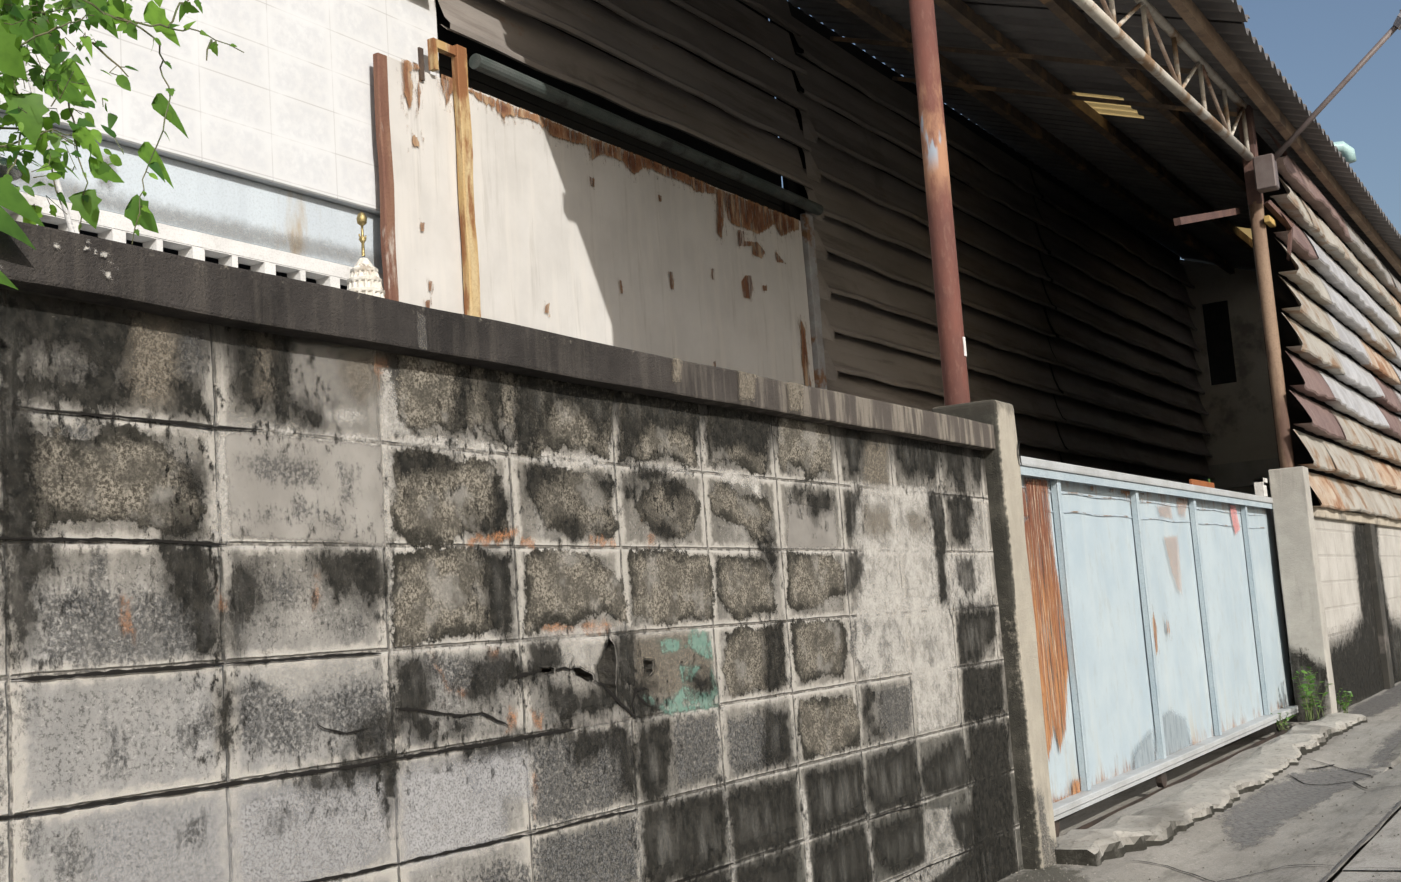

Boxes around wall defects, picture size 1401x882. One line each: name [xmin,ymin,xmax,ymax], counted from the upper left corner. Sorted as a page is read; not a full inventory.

rust [402,60,421,110]
rust [438,74,802,264]
rust [741,275,767,299]
peeling [381,354,861,760]
rust [1022,478,1069,762]
water stain [1289,523,1401,722]
crack [512,667,652,718]
crack [0,708,575,820]
rust [1053,778,1081,803]
water stain [1219,728,1401,849]